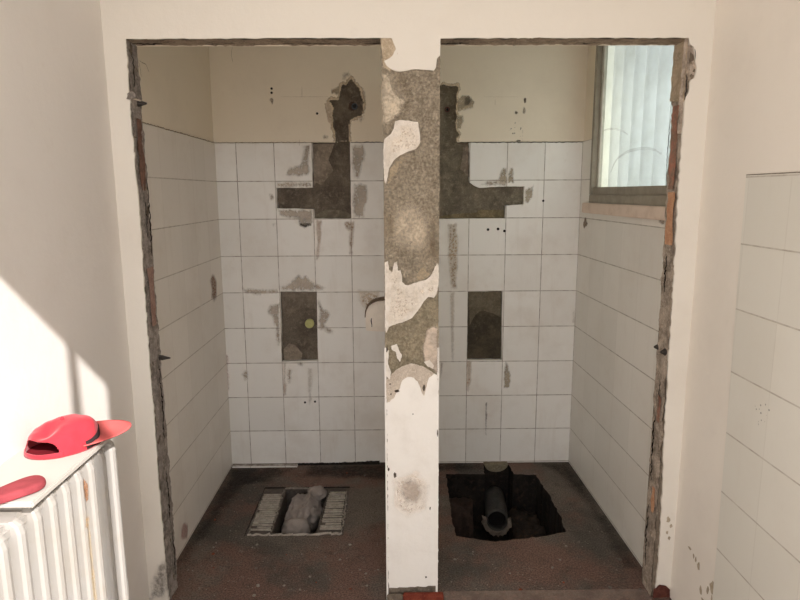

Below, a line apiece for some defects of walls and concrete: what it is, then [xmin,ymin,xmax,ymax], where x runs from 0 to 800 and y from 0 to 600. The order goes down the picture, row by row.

flaking render [136,118,146,191]
spalling [665,38,696,245]
spalling [380,38,440,402]
flaking render [147,266,156,326]
peeling [281,291,318,360]
peeling [467,291,502,359]